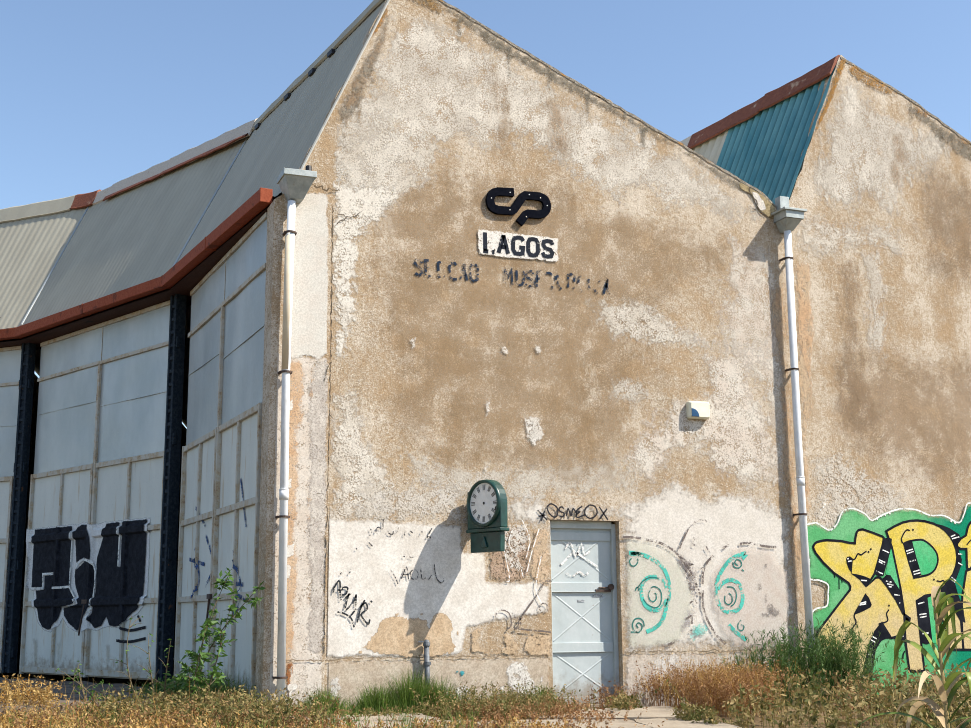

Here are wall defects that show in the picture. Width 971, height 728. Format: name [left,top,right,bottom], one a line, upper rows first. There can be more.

damp [437,2,743,190]
damp [910,102,971,159]
spalling [525,417,544,445]
damp [841,323,971,477]
peeling [285,359,328,700]
peeling [490,527,549,586]
peeling [328,613,551,711]